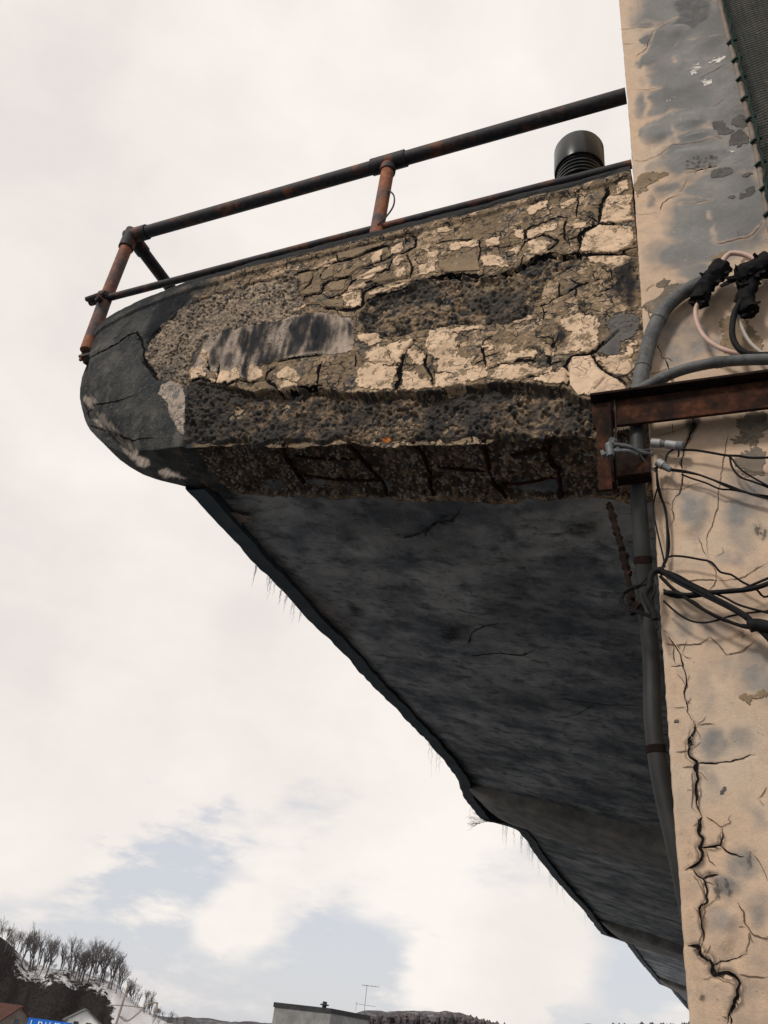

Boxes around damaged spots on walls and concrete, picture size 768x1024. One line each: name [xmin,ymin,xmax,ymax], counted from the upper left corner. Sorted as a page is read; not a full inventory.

crack [84,329,162,442]
crack [192,353,323,400]
spalling [145,171,690,500]
crack [293,136,731,396]
crack [655,419,764,590]
crack [663,630,768,1024]